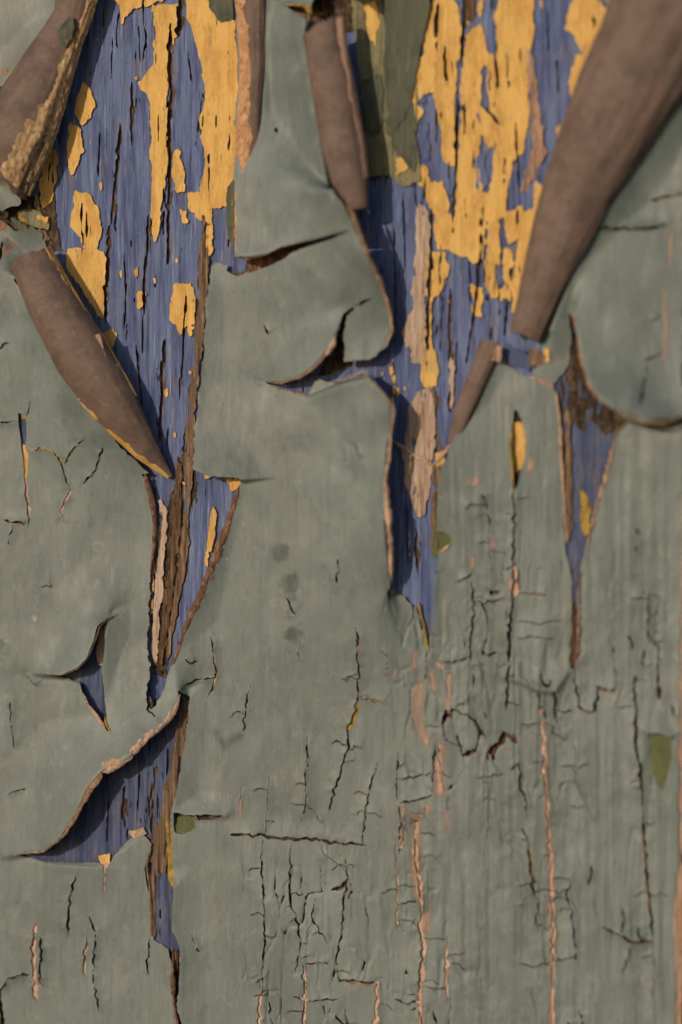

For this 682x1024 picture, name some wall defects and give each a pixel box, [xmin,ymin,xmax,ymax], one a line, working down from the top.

crack [0,210,9,260]
peeling [0,0,682,795]
crack [231,485,675,1024]
crack [101,863,109,890]
peeling [13,694,222,1024]
crack [0,925,43,1024]
crack [67,879,99,1008]